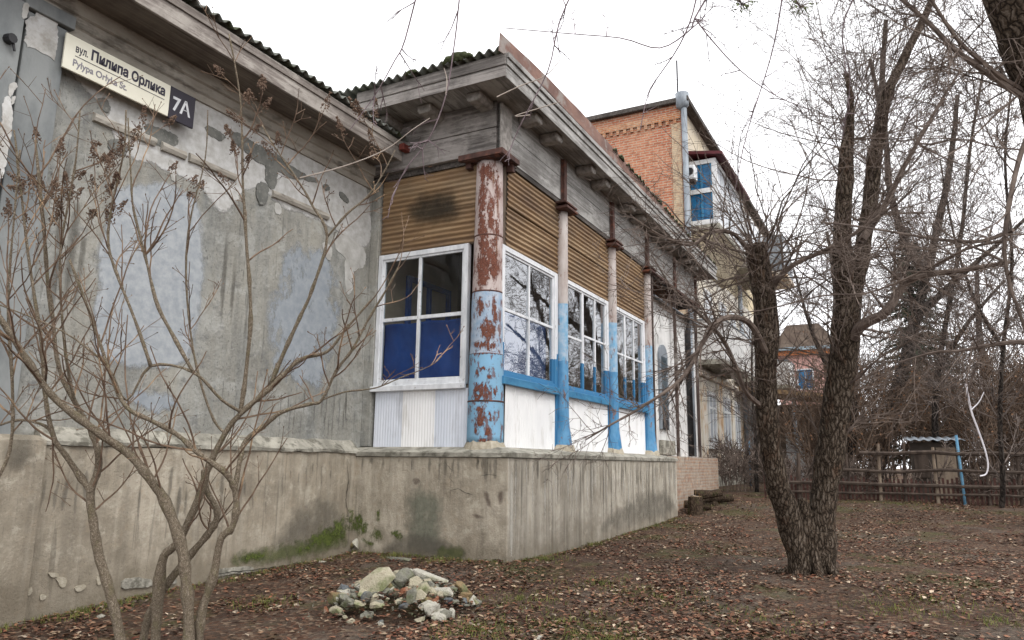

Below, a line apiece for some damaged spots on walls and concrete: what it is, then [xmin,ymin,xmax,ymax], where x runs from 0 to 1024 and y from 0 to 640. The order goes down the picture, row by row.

peeling [0,82,18,179]
peeling [22,3,59,61]
peeling [72,72,371,295]
corrosion [473,161,500,442]